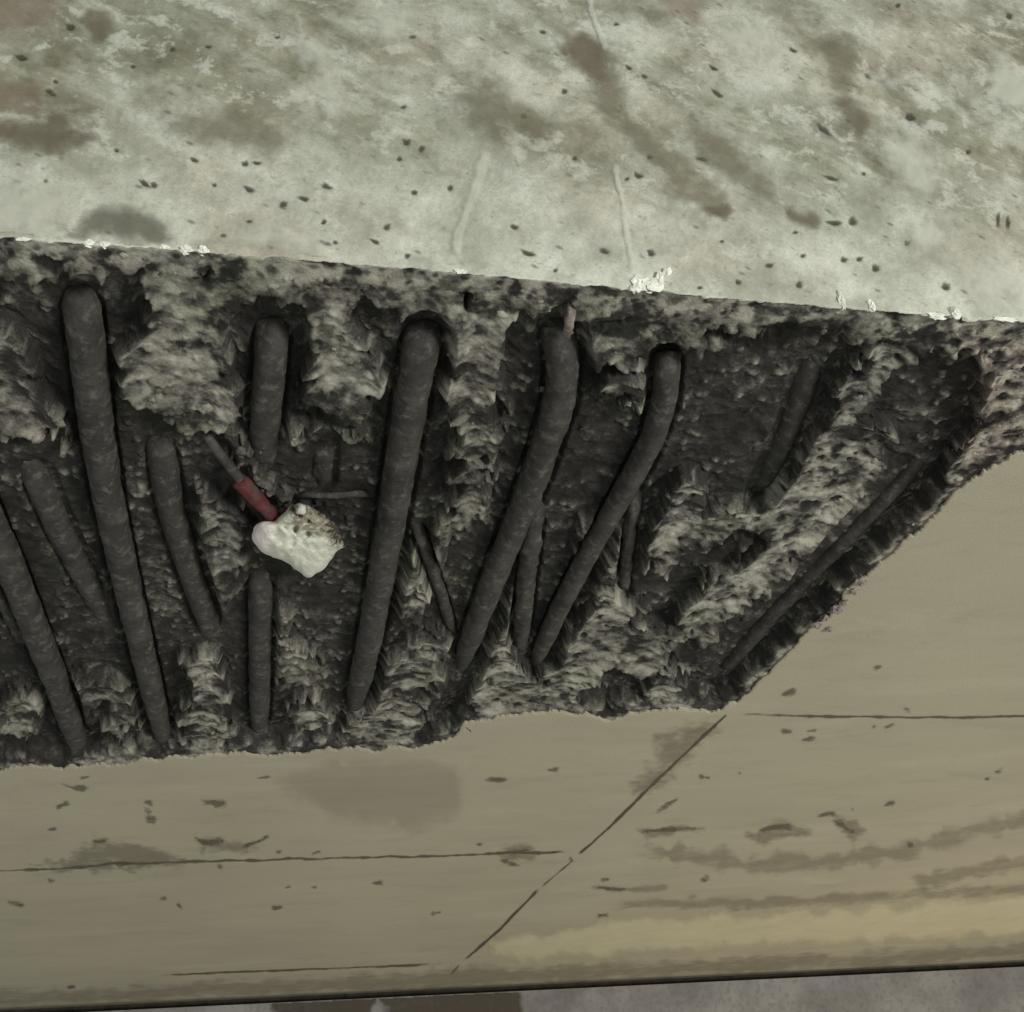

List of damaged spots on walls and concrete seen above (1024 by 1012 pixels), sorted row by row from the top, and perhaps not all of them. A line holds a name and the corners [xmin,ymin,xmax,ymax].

water stain [563,35,619,112]
water stain [625,125,732,216]
water stain [82,209,166,242]
spalling [0,237,1024,770]
crack [775,713,1024,721]
crack [0,716,726,975]